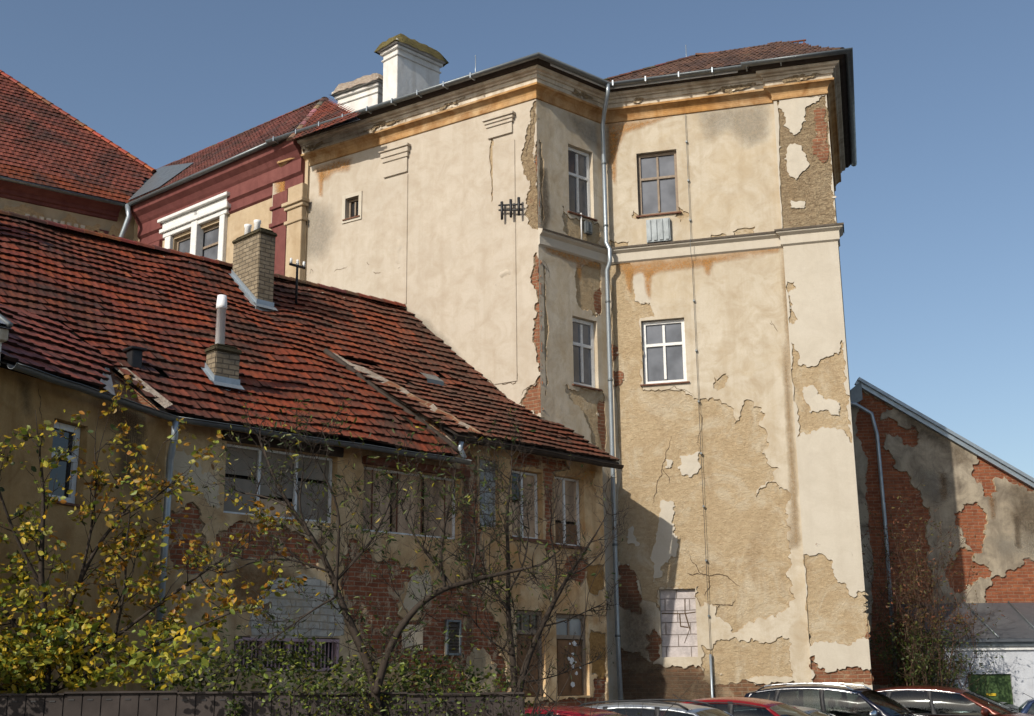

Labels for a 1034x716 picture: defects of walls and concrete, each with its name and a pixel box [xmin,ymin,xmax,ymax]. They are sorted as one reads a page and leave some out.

flaking render [521,101,545,229]
flaking render [777,95,837,228]
flaking render [519,252,549,415]
flaking render [509,453,571,551]
flaking render [564,262,1034,703]
flaking render [168,449,511,693]
flaking render [525,630,608,708]